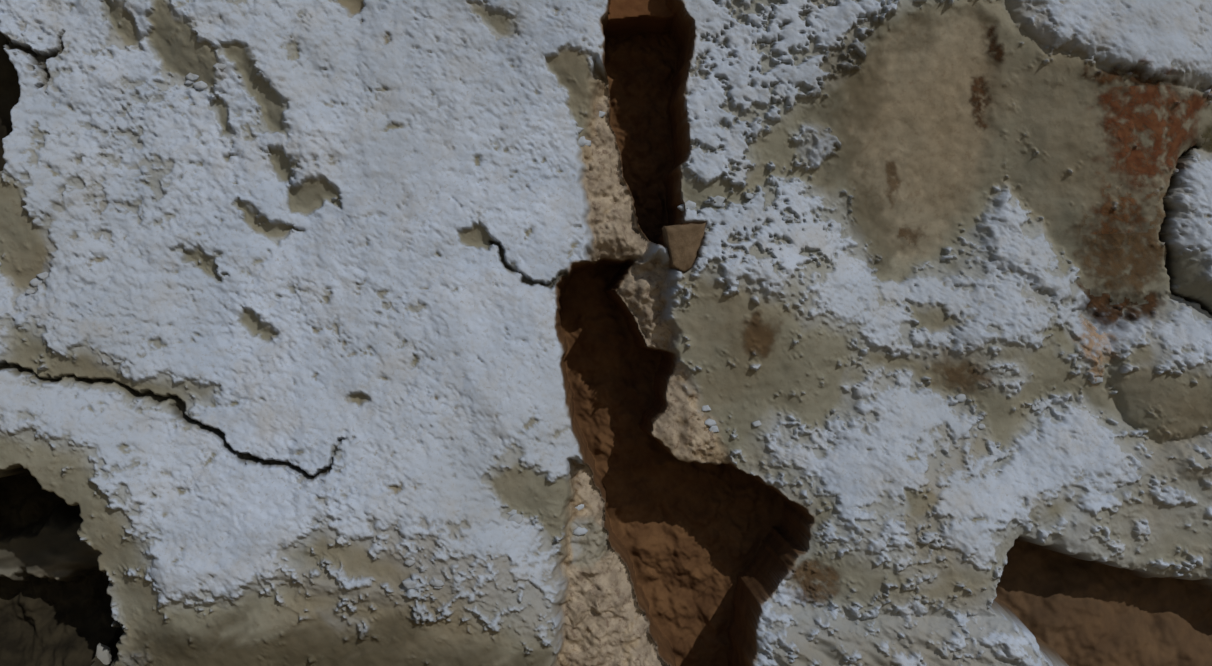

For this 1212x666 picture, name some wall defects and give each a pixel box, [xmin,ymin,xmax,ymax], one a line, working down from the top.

leakage [988,26,1004,62]
peeling [554,64,606,153]
leakage [970,77,990,128]
peeling [677,166,775,212]
rust [1078,60,1212,377]
crack [490,0,810,666]
crack [0,362,348,483]
peeling [96,643,112,665]